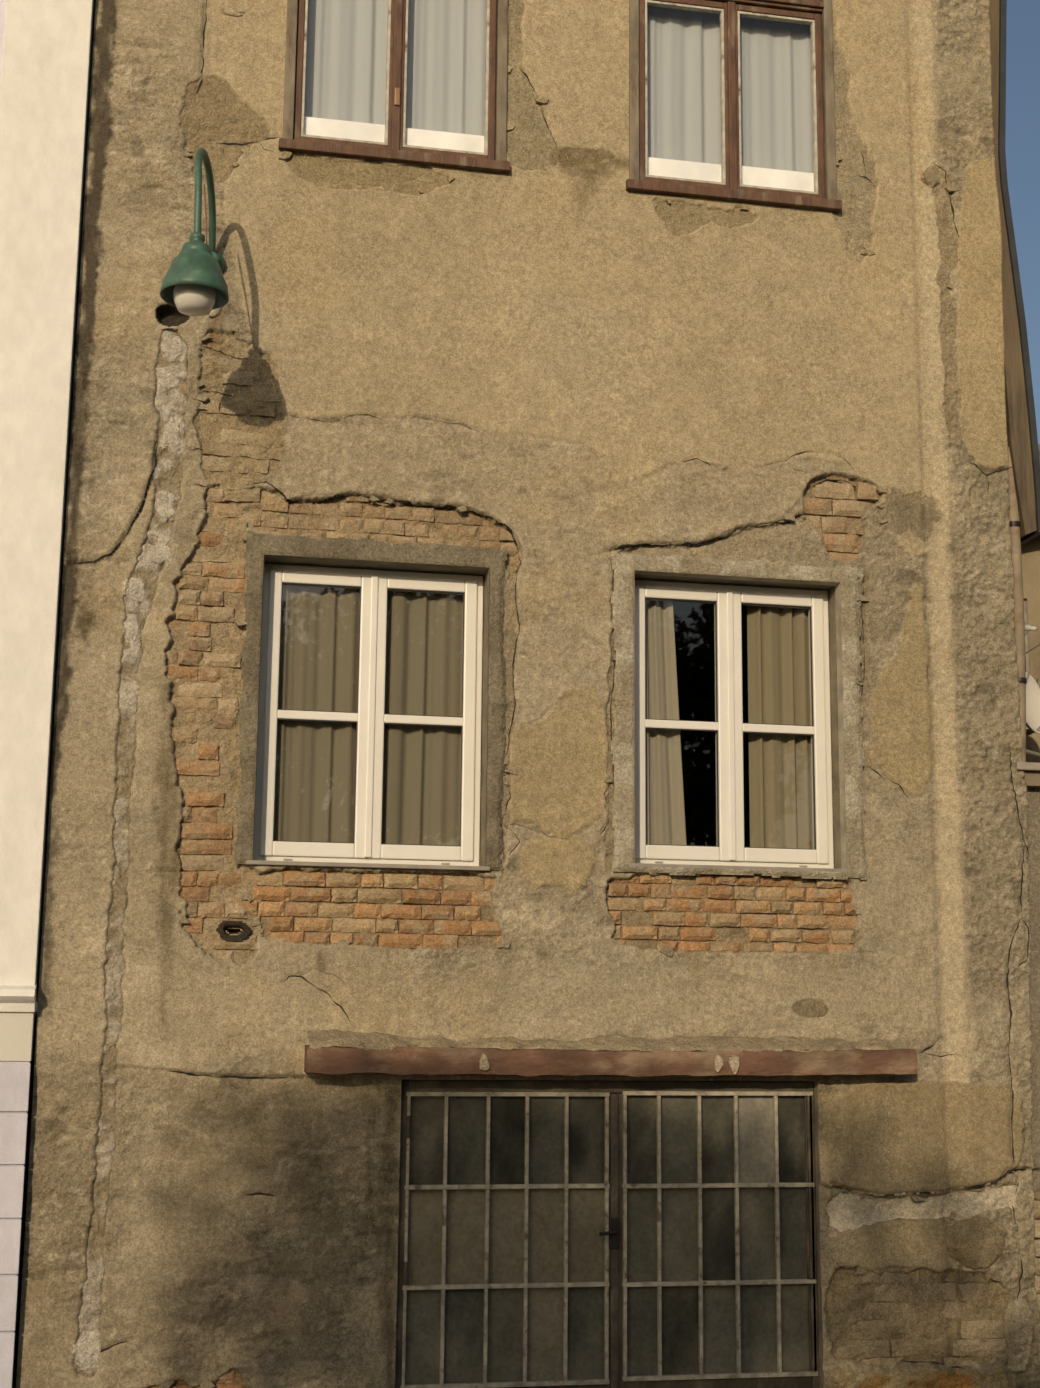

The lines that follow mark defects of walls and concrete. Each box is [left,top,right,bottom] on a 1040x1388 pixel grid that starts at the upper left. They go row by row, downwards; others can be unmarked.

spalling [180,73,270,183]
spalling [279,150,455,196]
spalling [932,165,959,443]
water stain [50,0,116,795]
crack [71,441,158,564]
flaking render [165,328,520,965]
spalling [619,474,942,746]
flaking render [602,581,862,957]
crack [285,969,350,1021]
spalling [826,1178,1019,1232]
crack [80,1341,127,1372]
flaking render [130,1369,246,1388]